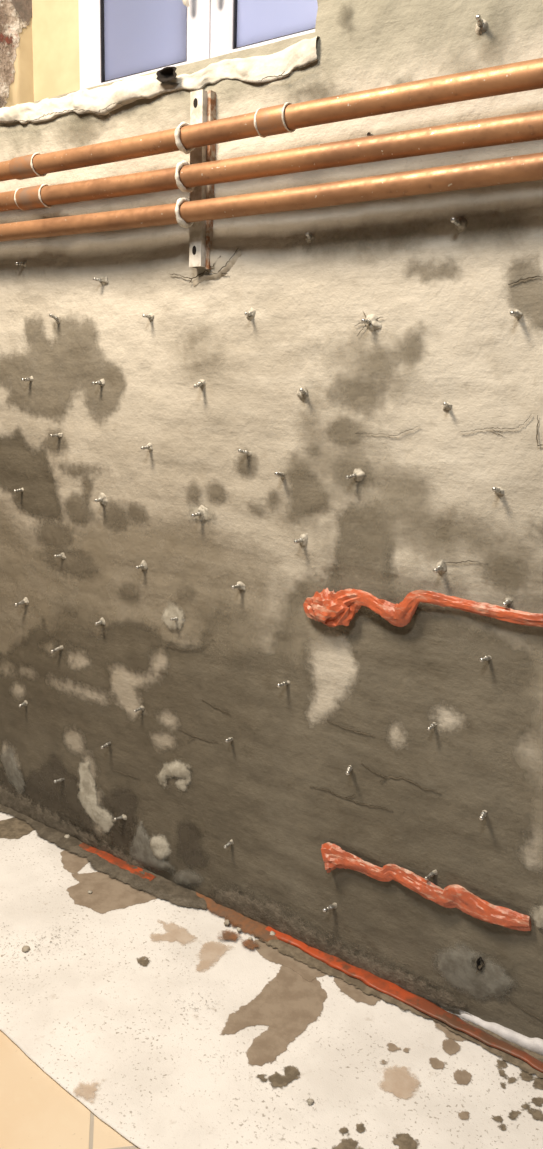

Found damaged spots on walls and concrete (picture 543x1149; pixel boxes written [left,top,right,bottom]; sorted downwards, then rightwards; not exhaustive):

flaking render [0,0,32,108]
leakage [508,262,543,328]
crack [459,415,541,446]
leakage [0,319,543,1039]
leakage [221,937,382,1088]
leakage [429,1020,472,1085]